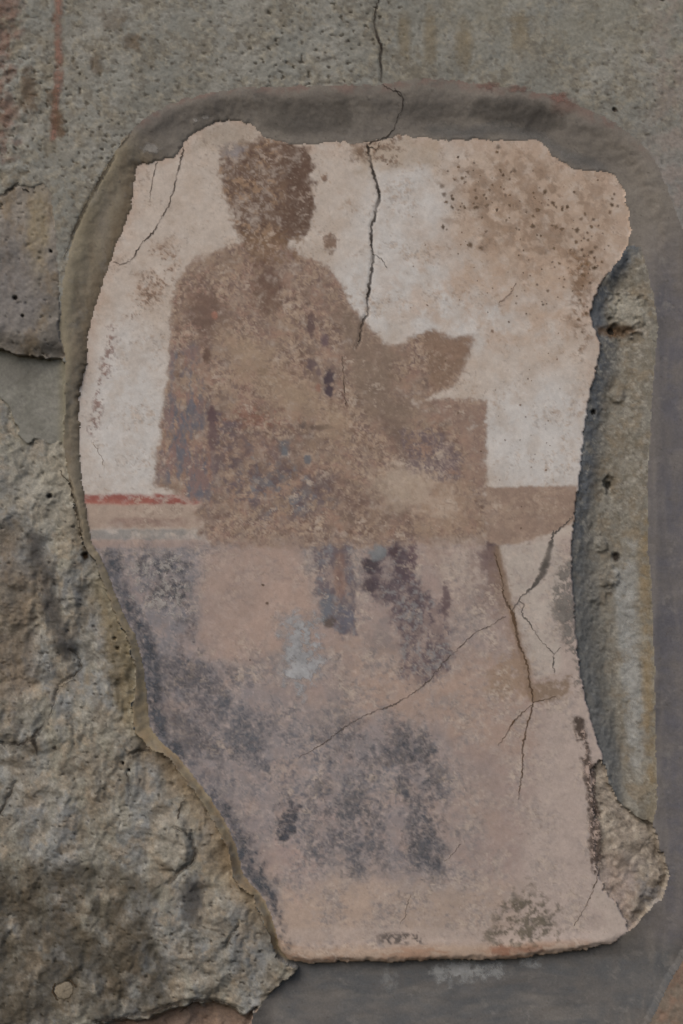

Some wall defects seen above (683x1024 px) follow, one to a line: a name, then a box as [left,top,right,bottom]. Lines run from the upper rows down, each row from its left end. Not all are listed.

crack [115,149,184,264]
crack [358,0,404,343]
crack [300,518,570,792]
spalling [551,213,670,931]